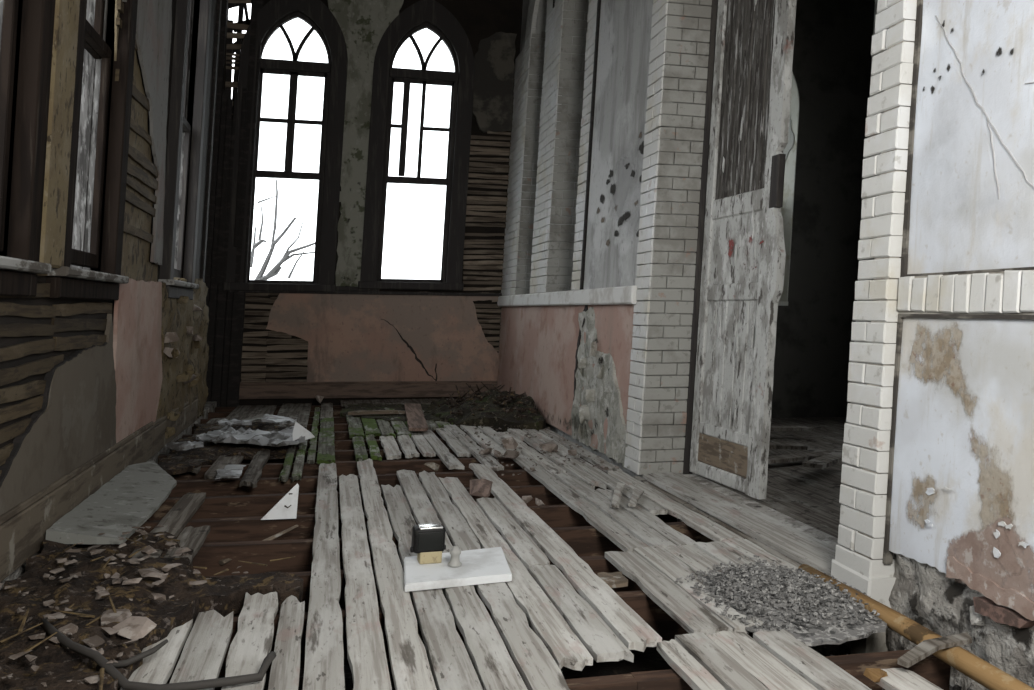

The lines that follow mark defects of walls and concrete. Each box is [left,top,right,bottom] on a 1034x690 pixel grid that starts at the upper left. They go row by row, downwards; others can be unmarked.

flaking render [114,0,124,81]
crack [935,15,1034,199]
spalling [121,39,209,439]
flaking render [462,131,511,353]
flaking render [0,273,112,487]
crack [382,319,437,381]
flaking render [571,307,630,469]
flaking render [909,322,977,416]
flaking render [907,475,953,528]
spalling [909,593,951,625]
flaking render [944,429,1034,652]